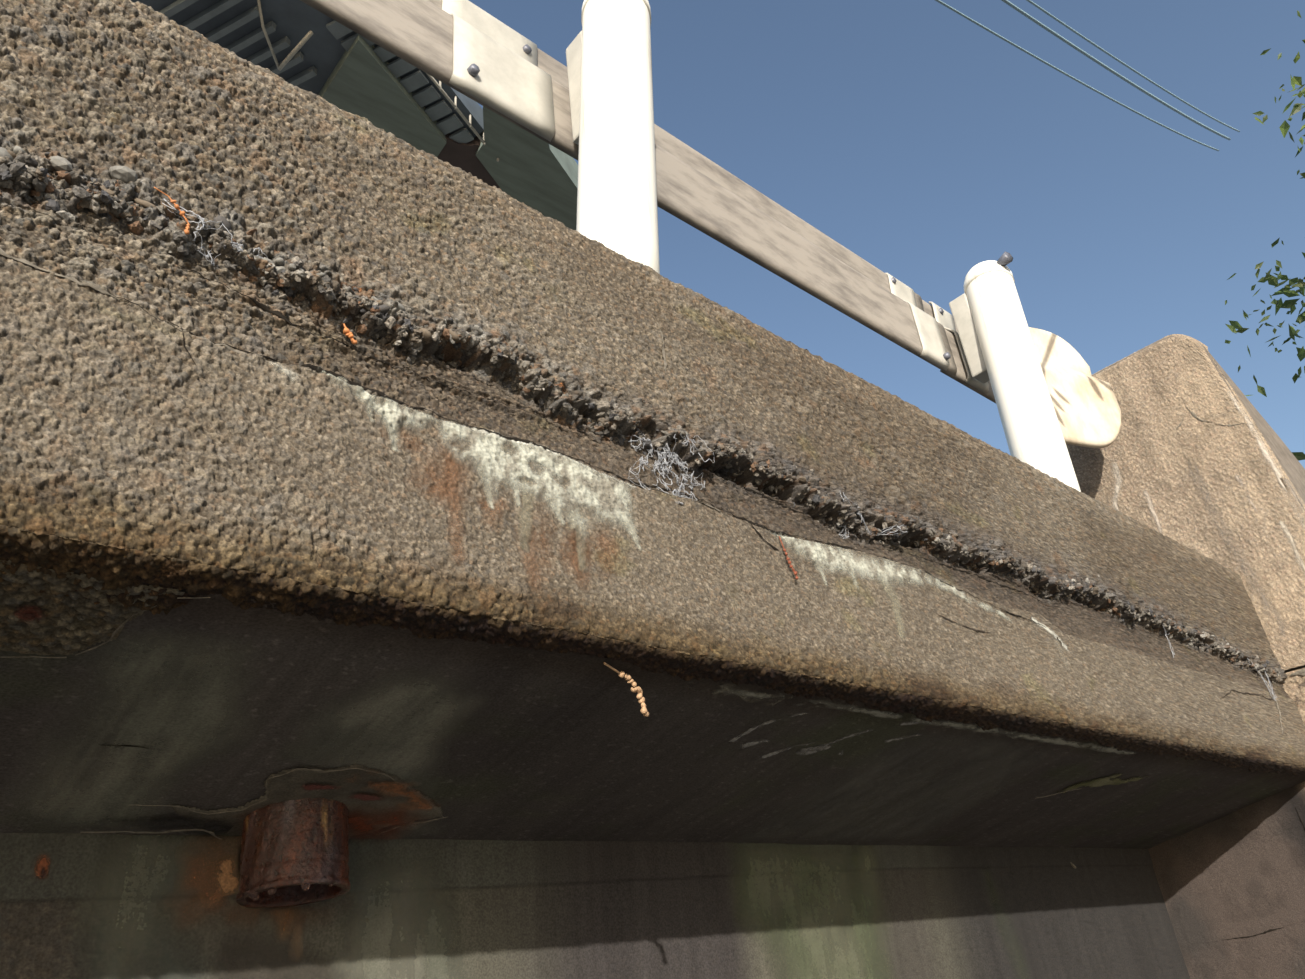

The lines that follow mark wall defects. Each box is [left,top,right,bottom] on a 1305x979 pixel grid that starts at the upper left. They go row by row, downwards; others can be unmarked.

damp [328,374,641,549]
crack [0,248,1045,633]
crack [1176,389,1252,429]
damp [776,535,966,636]
rust [189,848,241,905]